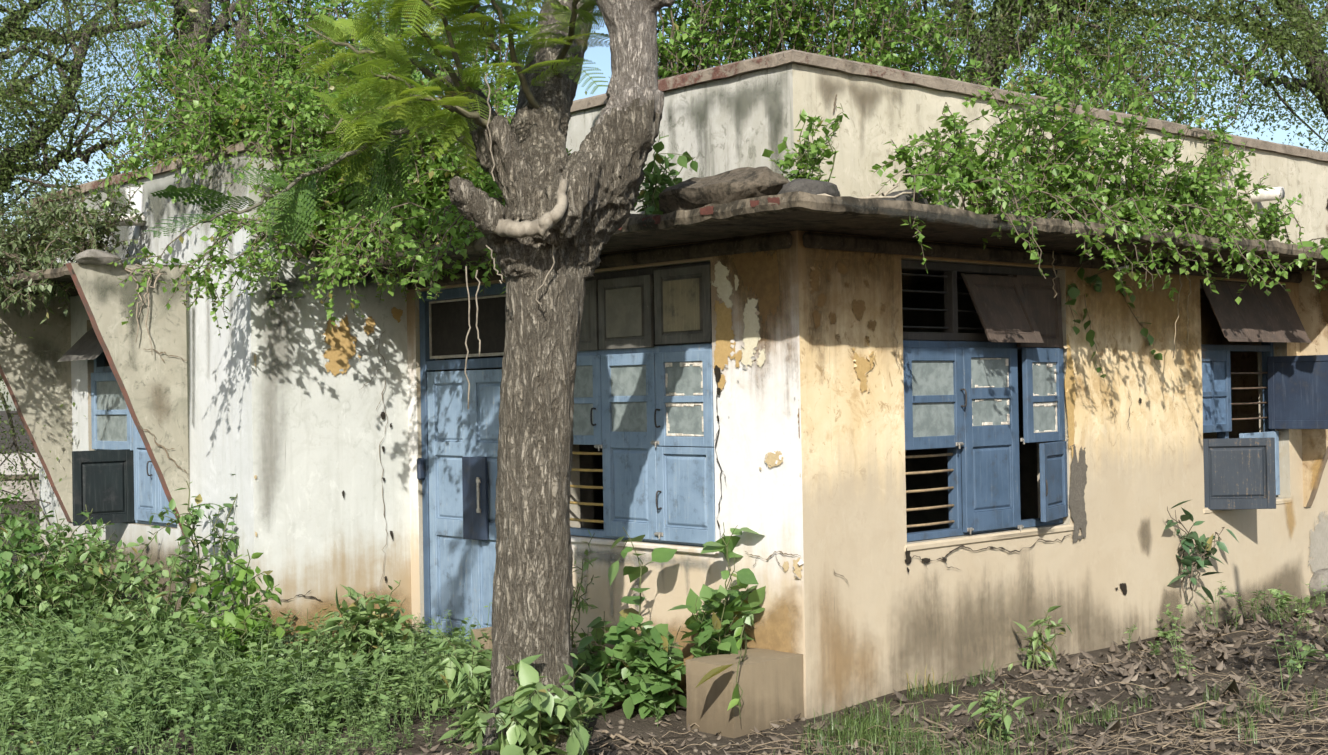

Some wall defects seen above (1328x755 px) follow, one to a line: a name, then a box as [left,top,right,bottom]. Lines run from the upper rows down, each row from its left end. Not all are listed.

damp [822,79,877,106]
peeling [321,314,376,376]
peeling [711,260,766,390]
crack [362,332,393,595]
peeling [759,449,783,470]
crack [908,534,1074,570]
damp [906,599,1091,660]
damp [1160,592,1180,635]
damp [1205,570,1300,617]